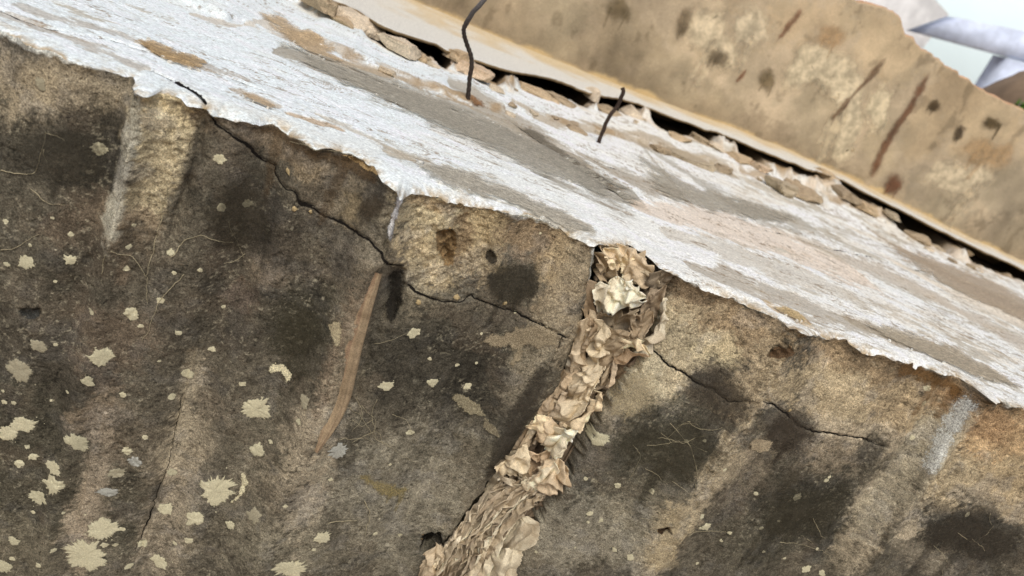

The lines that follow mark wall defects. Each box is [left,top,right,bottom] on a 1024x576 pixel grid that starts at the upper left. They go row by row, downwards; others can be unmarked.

spalling [134,37,208,72]
peeling [259,11,638,205]
crack [87,36,567,348]
peeling [415,160,593,232]
damp [484,260,541,306]
peeling [879,240,1024,320]
crack [649,350,713,388]
damp [763,414,814,453]
crack [763,401,886,447]
damp [899,364,979,474]
crack [134,394,183,552]
damp [923,511,1022,564]